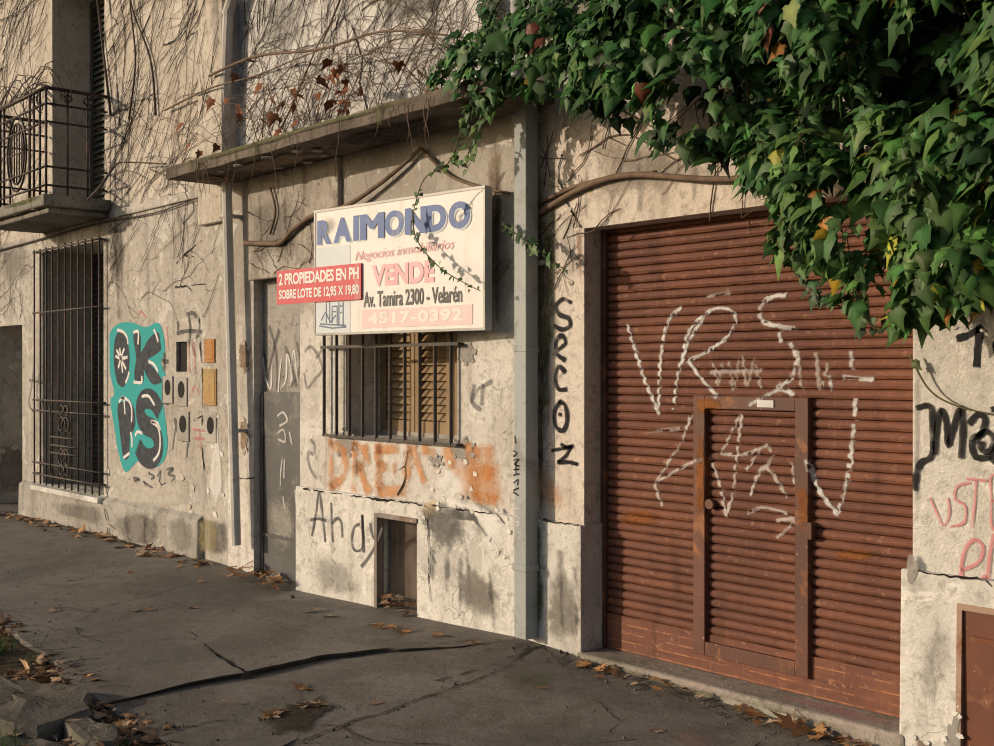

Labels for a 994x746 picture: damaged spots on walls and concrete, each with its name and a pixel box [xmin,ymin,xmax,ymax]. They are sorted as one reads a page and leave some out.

rust [696,439,712,508]
rust [798,490,815,527]
damp [423,511,460,571]
damp [445,558,495,612]
crack [918,570,994,587]
spalling [941,710,964,746]